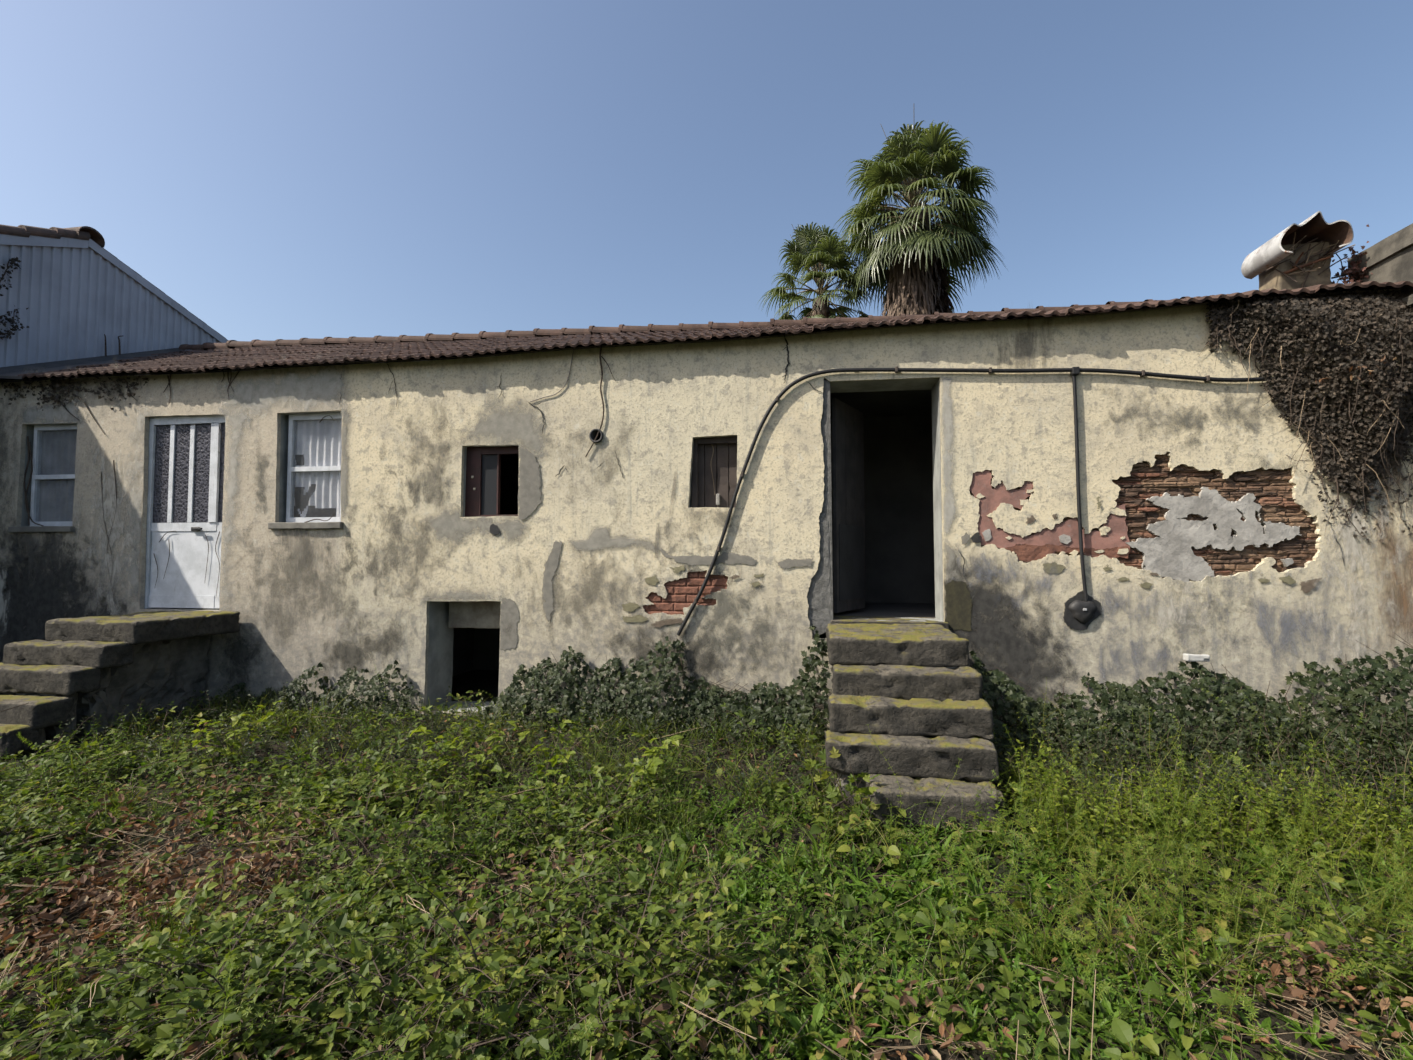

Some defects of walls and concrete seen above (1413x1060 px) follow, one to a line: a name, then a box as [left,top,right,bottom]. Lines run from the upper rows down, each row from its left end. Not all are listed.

flaking render [961,453,1322,593]
flaking render [622,565,764,628]
damp [944,555,1076,711]